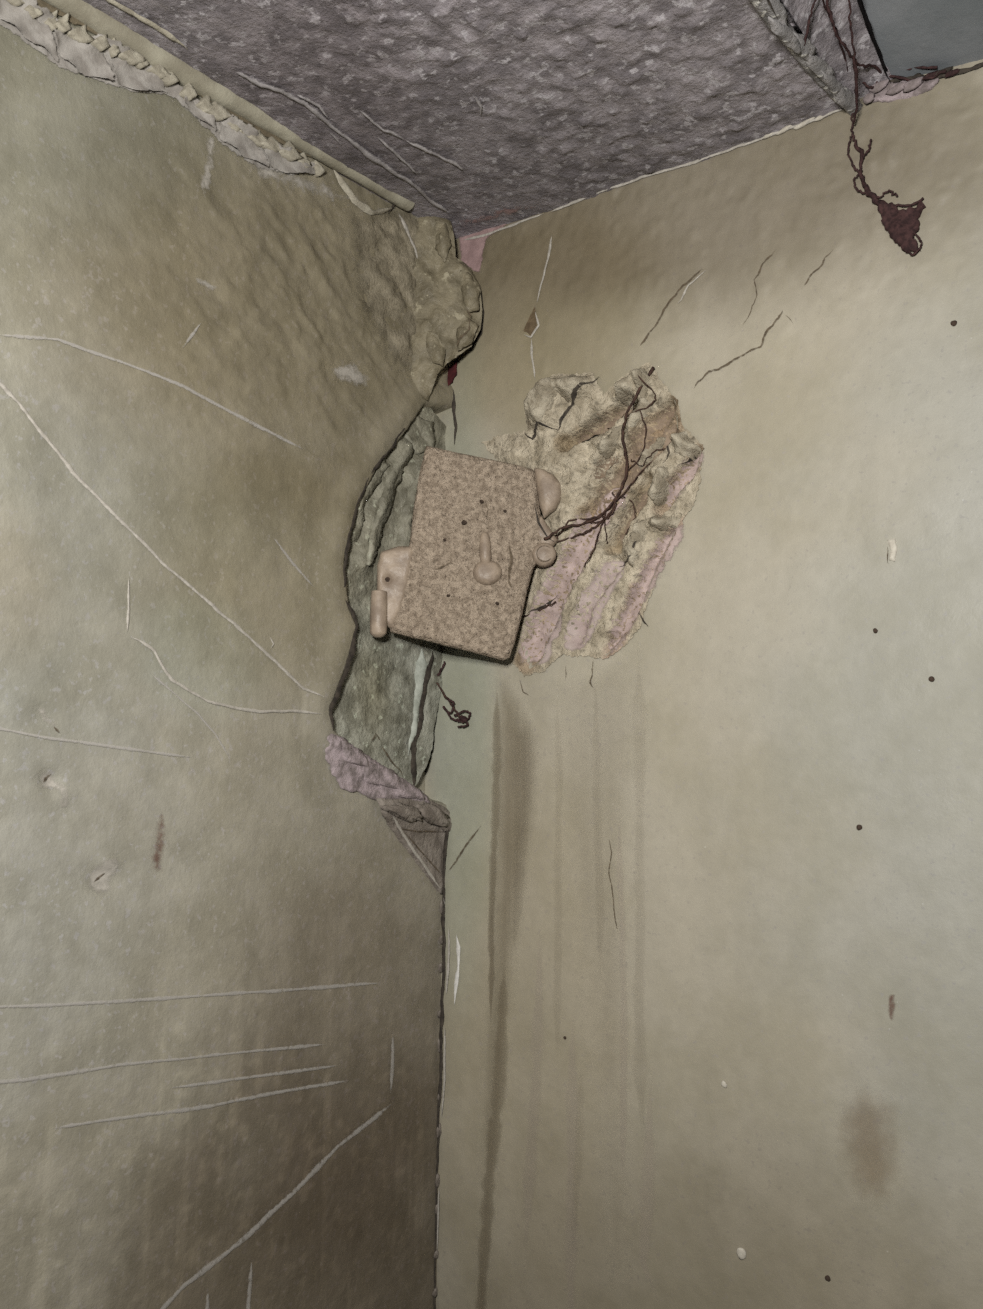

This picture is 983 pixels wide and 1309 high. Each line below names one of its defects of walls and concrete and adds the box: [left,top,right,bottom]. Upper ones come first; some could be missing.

peeling [0,0,333,196]
crack [523,109,844,386]
flaking render [325,407,452,895]
flaking render [481,362,704,695]